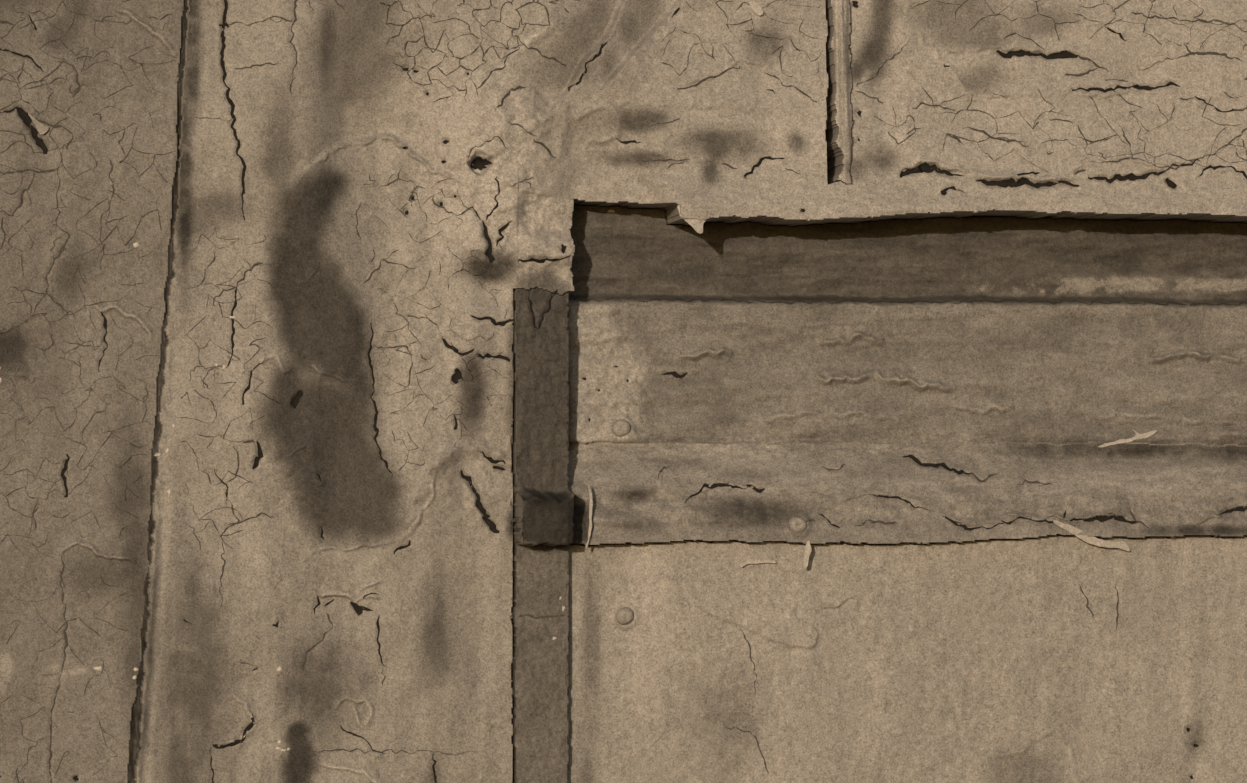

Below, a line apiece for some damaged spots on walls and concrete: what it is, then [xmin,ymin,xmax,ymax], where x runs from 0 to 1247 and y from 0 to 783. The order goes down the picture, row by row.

crack [195,0,345,220]
crack [906,6,1247,179]
peeling [677,204,707,234]
crack [355,35,1246,475]
water stain [269,174,395,533]
peeling [1098,429,1157,447]
crack [461,451,505,533]
peeling [585,484,593,549]
crack [685,483,765,502]
peeling [650,456,845,503]
crack [806,455,1149,531]
peeling [999,497,1139,551]